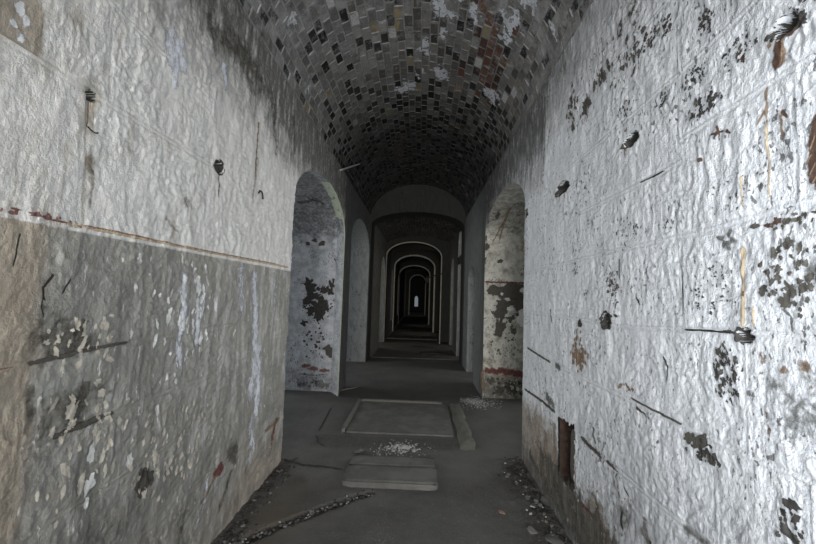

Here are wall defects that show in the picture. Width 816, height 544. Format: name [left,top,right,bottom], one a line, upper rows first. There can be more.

damp [207,13,265,94]
peeling [566,0,672,145]
peeling [682,62,723,121]
peeling [698,8,715,36]
spalling [721,0,807,72]
peeling [300,276,335,372]
peeling [484,283,524,356]
rust [570,329,589,371]
peeling [713,327,755,406]
damp [529,423,629,544]
spalling [683,432,721,468]